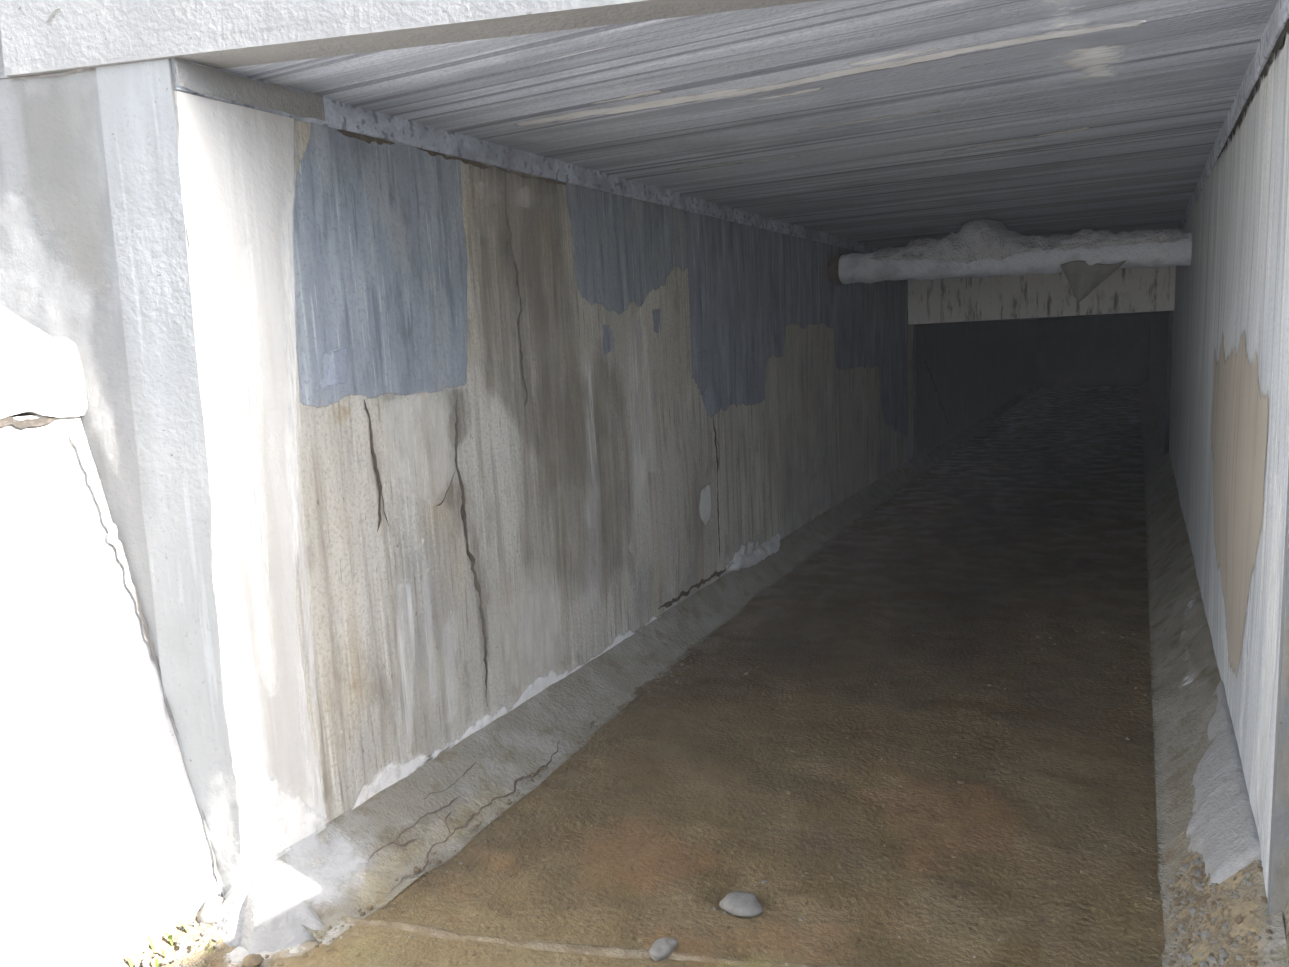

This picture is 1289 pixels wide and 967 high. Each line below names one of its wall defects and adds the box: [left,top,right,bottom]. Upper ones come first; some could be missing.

peeling [292,123,468,407]
peeling [565,183,908,437]
crack [364,399,389,532]
crack [436,390,488,707]
crack [658,420,727,609]
peeling [1211,332,1268,676]
crack [367,740,560,891]
leakage [353,616,657,809]